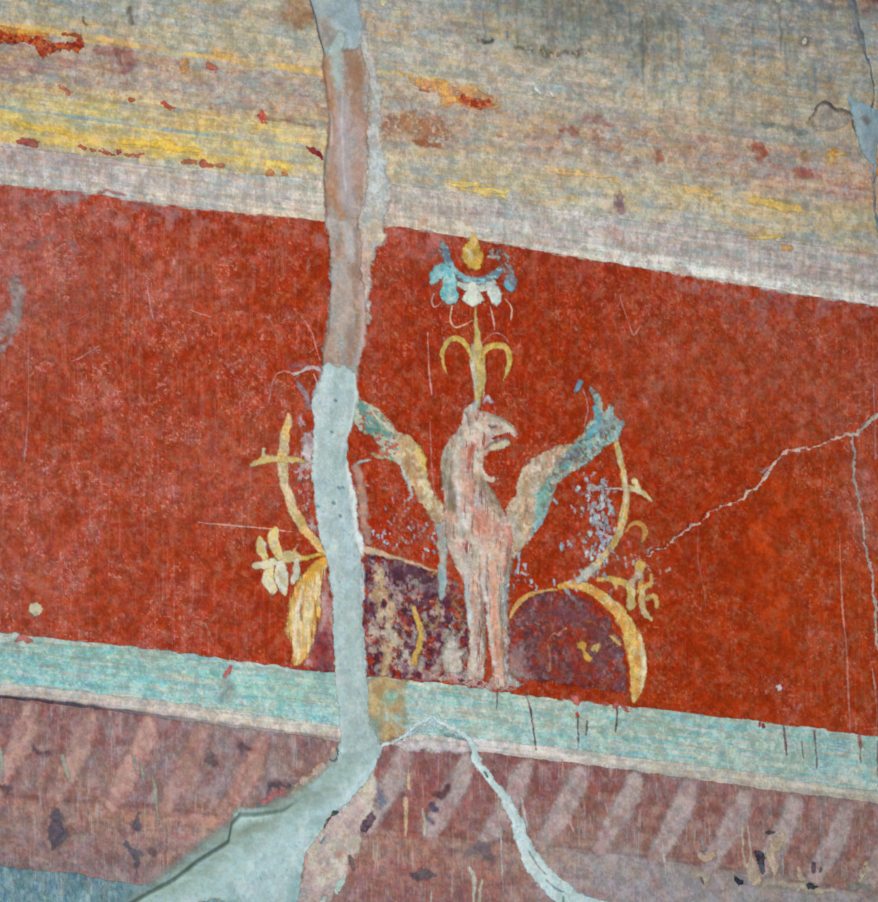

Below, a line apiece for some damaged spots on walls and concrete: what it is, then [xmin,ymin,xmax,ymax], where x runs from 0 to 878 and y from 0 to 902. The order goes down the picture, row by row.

peeling [0,25,84,59]
crack [848,0,875,108]
peeling [381,71,500,148]
spalling [808,96,878,176]
crack [870,163,878,230]
crack [124,0,607,902]
crack [647,413,878,650]